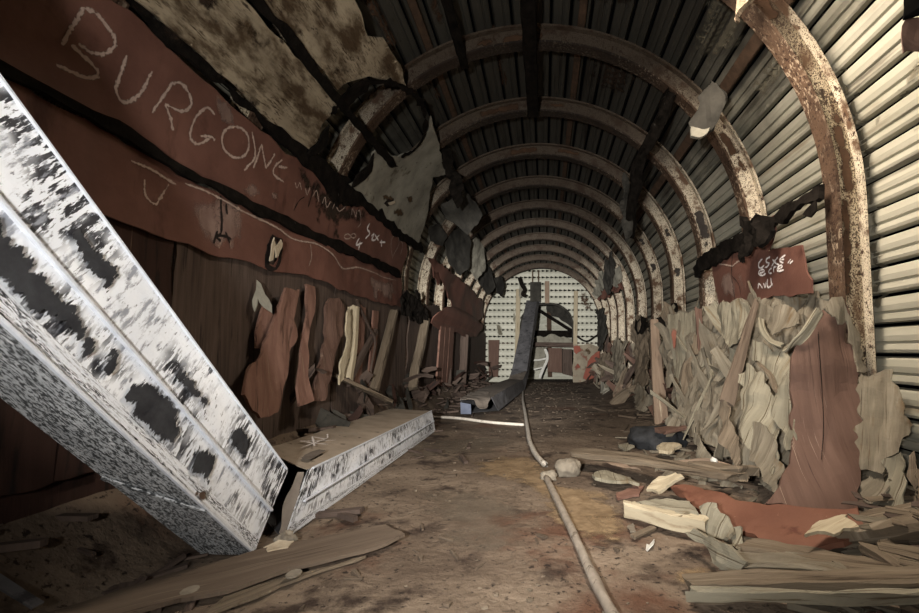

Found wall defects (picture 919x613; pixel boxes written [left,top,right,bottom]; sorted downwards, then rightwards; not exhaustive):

rust [719,132,747,171]
rust [829,98,861,296]
peeling [717,298,751,348]
peeling [751,340,798,451]
peeling [590,399,765,504]
peeling [787,603,901,613]